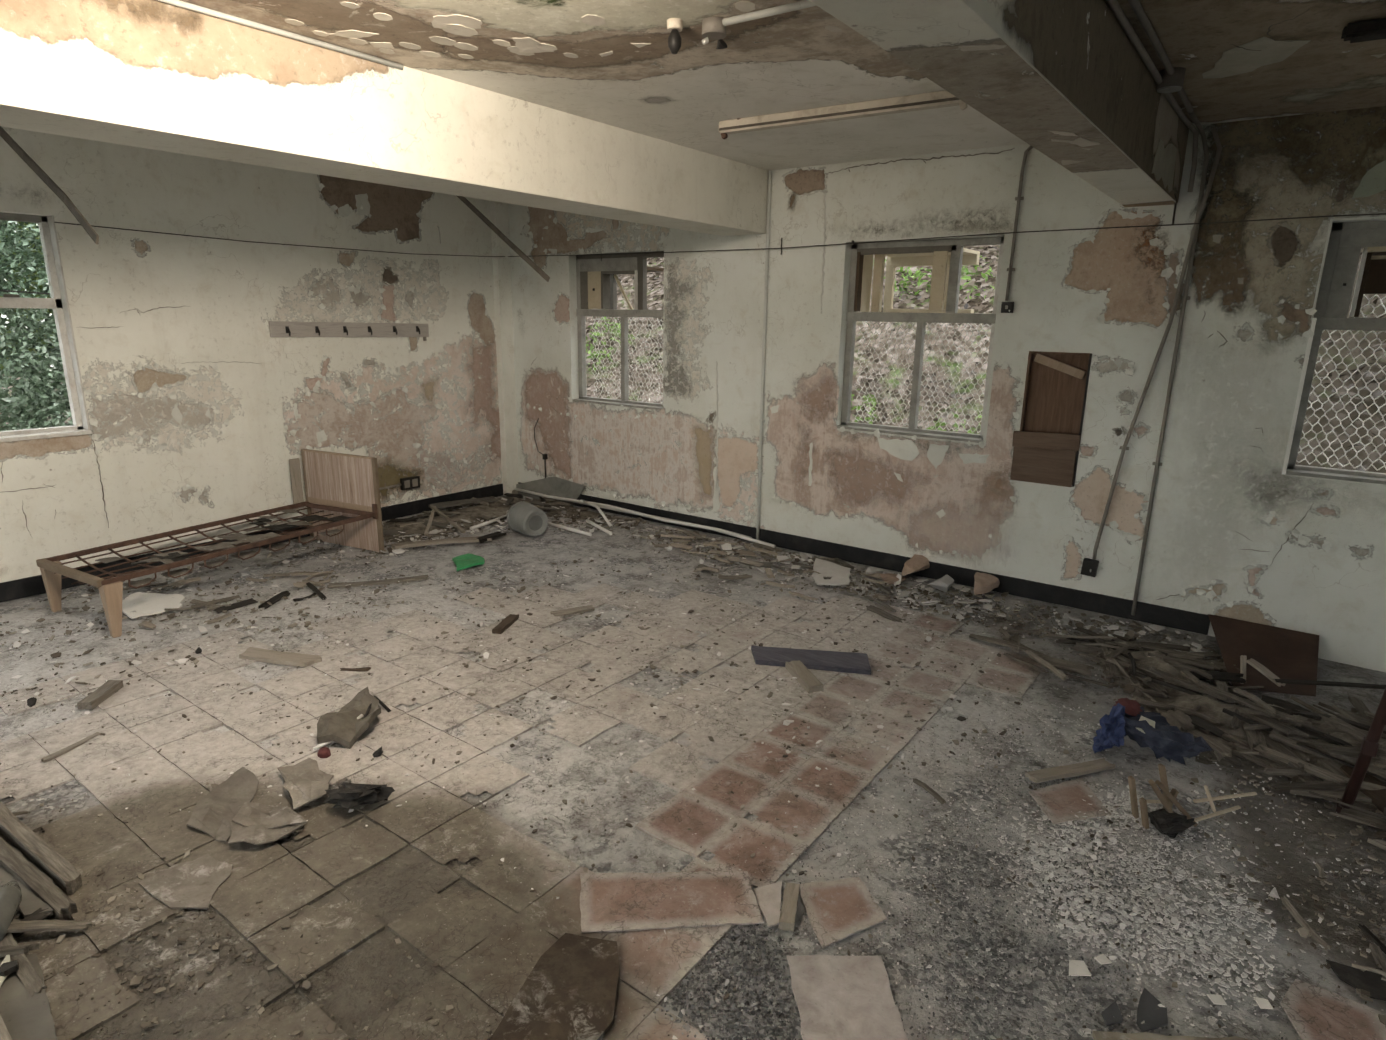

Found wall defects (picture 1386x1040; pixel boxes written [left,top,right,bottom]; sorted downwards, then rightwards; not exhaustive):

peeling [0,0,1138,173]
peeling [0,356,244,462]
peeling [308,250,416,323]
peeling [315,175,434,244]
peeling [282,289,502,507]
water stain [663,266,691,394]
peeling [518,206,1020,556]
peeling [1062,202,1185,327]
water stain [1003,0,1386,341]
peeling [1061,444,1153,580]